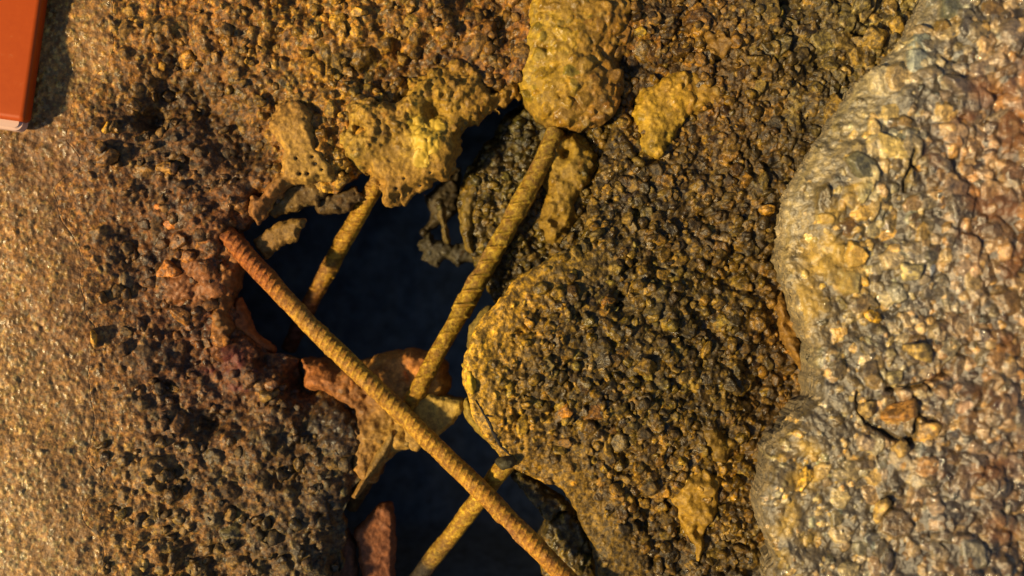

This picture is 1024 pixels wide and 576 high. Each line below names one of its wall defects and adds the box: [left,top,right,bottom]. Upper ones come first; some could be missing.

corrosion [169,246,246,368]
spalling [54,0,532,576]